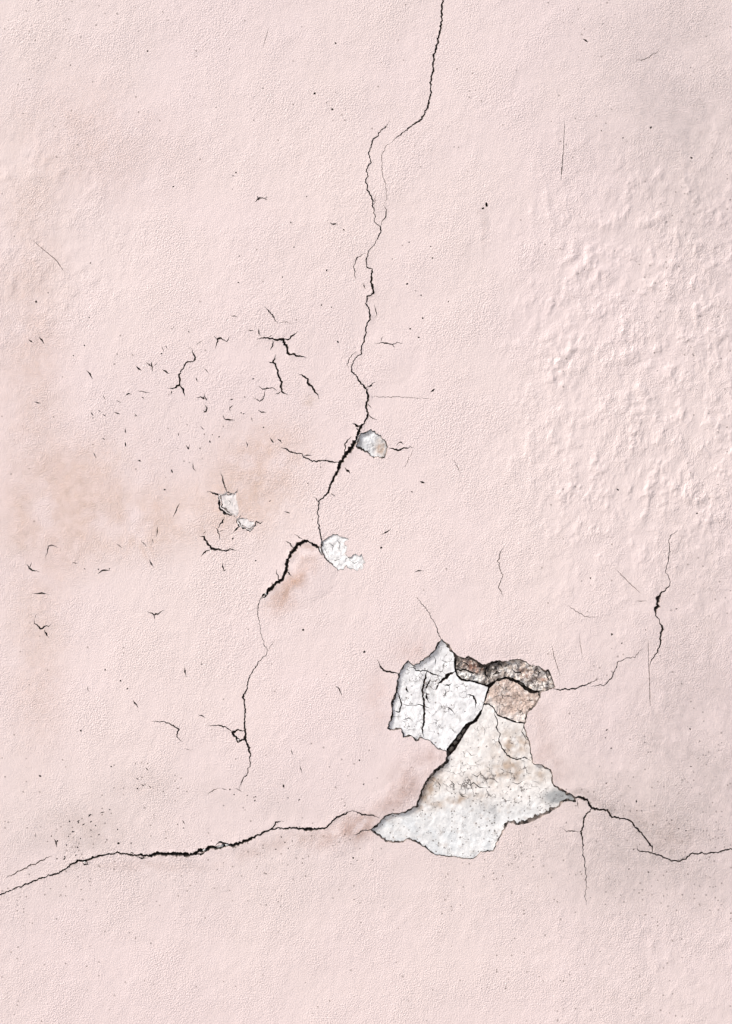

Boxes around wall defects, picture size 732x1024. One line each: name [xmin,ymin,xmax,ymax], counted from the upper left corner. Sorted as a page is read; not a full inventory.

crack [86,0,444,794]
spalling [353,429,388,459]
spalling [218,492,255,531]
spalling [318,534,365,571]
spalling [370,639,578,859]
crack [0,811,379,895]
crack [562,795,732,903]